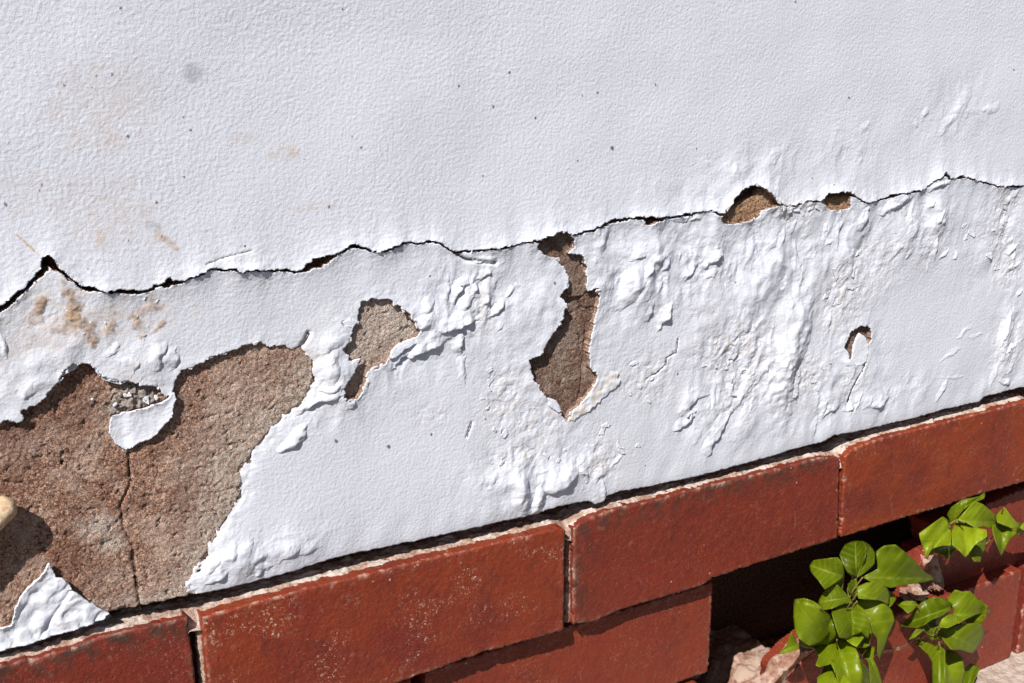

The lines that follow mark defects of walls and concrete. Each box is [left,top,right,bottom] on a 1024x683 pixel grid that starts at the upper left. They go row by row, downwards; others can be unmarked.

crack [609,213,686,222]
crack [733,186,757,205]
peeling [713,183,851,224]
crack [0,255,178,307]
crack [283,244,365,272]
peeling [342,298,418,397]
peeling [480,232,654,438]
peeling [845,326,869,366]
peeling [0,341,314,651]
crack [61,454,141,610]